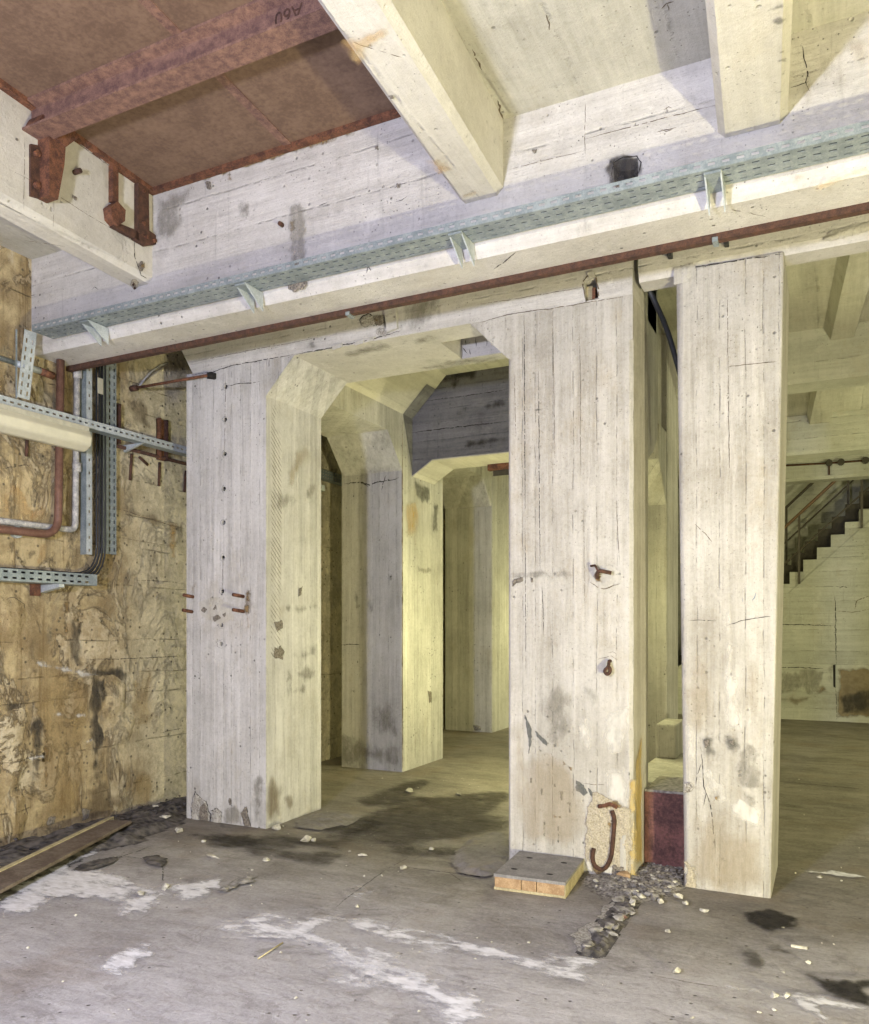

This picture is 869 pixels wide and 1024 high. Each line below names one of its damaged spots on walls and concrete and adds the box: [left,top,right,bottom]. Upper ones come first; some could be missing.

damp [78,669,126,767]
damp [838,668,869,717]
spalling [191,792,251,826]
damp [218,778,505,855]
spalling [585,788,633,876]
damp [0,851,221,915]
damp [103,944,152,975]
damp [220,914,597,1024]